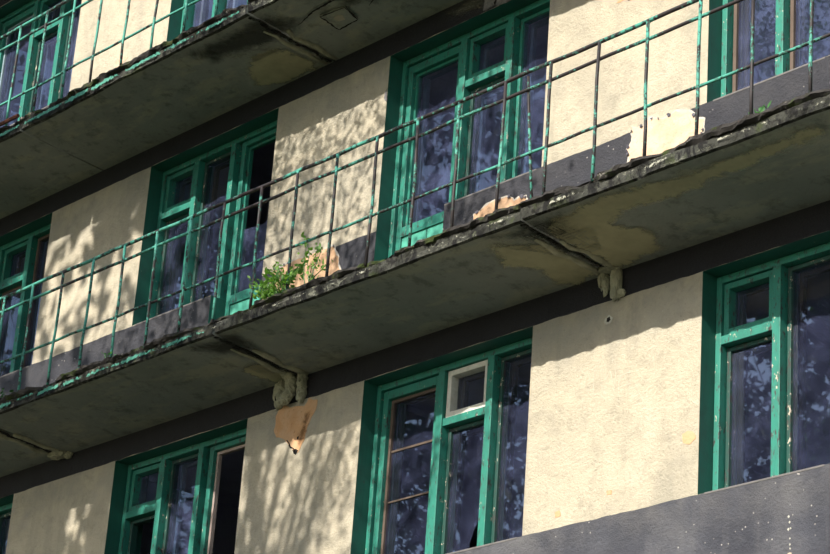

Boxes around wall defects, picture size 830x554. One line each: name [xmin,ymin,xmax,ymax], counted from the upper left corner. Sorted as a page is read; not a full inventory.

peeling [626,108,705,172]
peeling [473,194,528,223]
peeling [262,245,341,306]
peeling [274,398,318,455]